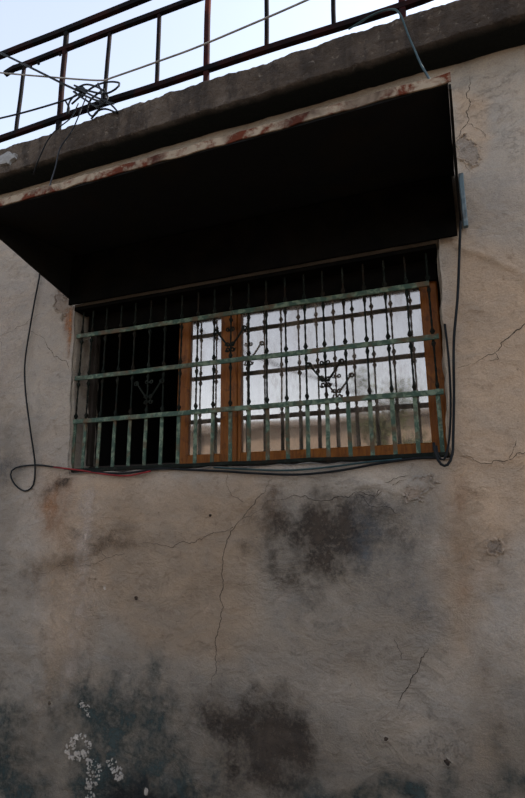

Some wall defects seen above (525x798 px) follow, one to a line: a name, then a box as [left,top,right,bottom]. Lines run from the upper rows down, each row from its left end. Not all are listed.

spalling [455,132,483,170]
crack [455,76,487,175]
crack [458,322,525,368]
crack [461,438,525,466]
crack [127,473,410,696]
damp [70,680,198,798]